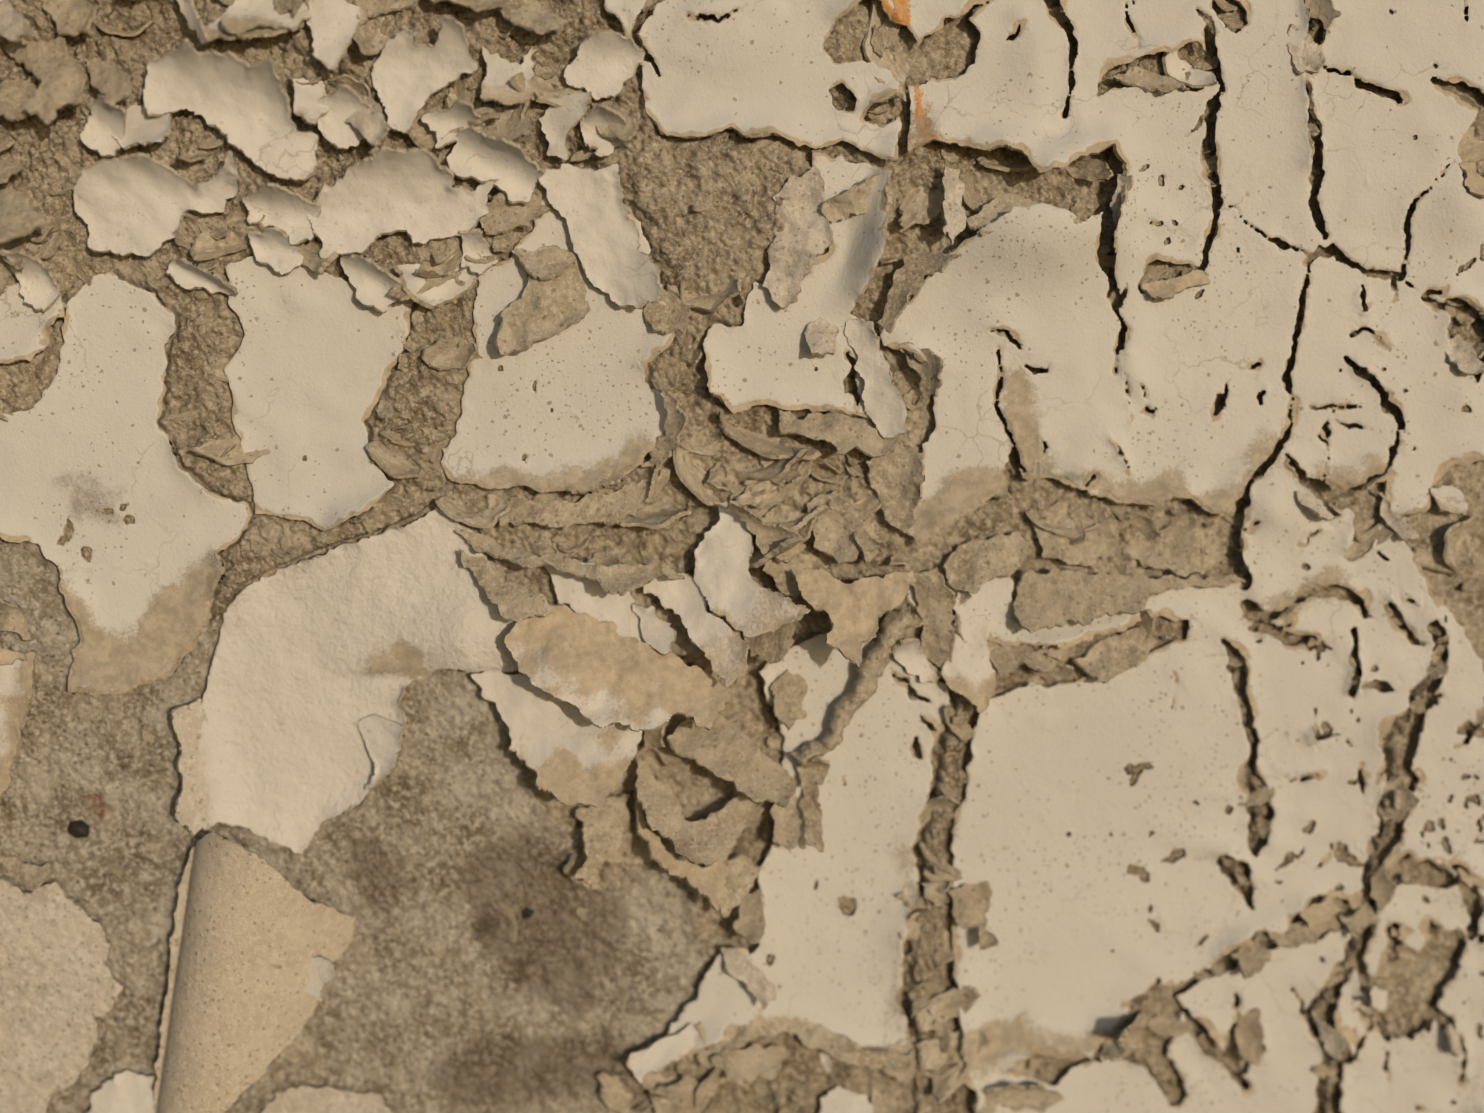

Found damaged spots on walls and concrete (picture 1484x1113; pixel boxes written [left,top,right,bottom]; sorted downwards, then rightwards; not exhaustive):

crack [1006,0,1078,119]
crack [1125,2,1136,33]
flaking render [1096,0,1248,103]
crack [1094,204,1157,413]
crack [991,329,1049,489]
flaking render [0,0,1134,1113]
peeling [920,475,1246,634]
crack [1131,18,1484,1113]
flaking render [1295,460,1484,671]
crack [892,673,935,760]
flaking render [1230,774,1484,1042]
flaking render [1012,993,1194,1106]